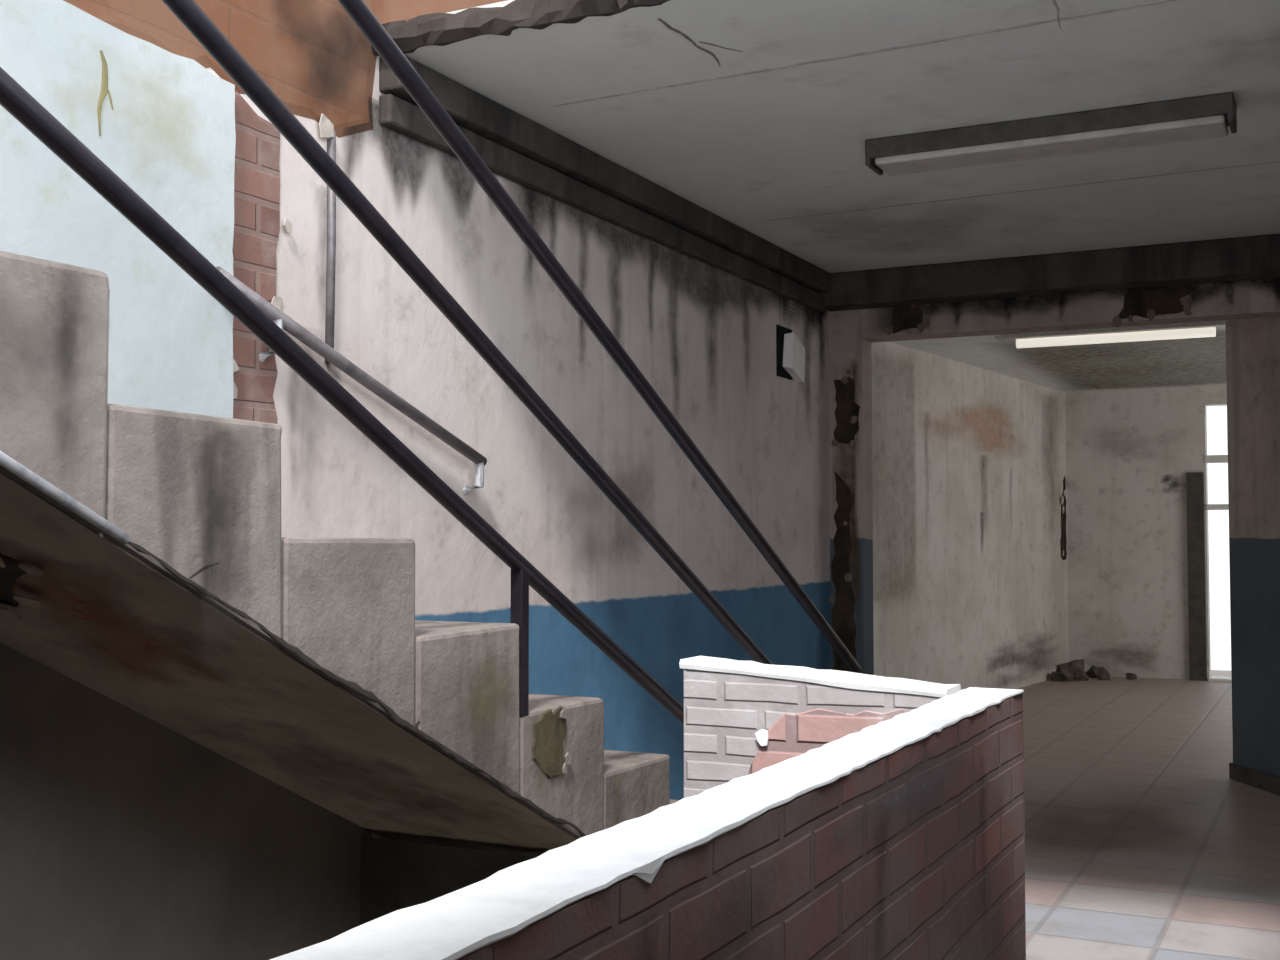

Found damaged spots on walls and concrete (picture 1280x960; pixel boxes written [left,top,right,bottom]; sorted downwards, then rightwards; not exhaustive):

crack [657,18,743,67]
crack [1052,0,1061,29]
water stain [521,185,823,364]
flaking render [1112,286,1193,327]
flaking render [831,369,860,447]
spalling [0,553,44,619]
flaking render [829,472,857,672]
spalling [532,706,571,778]